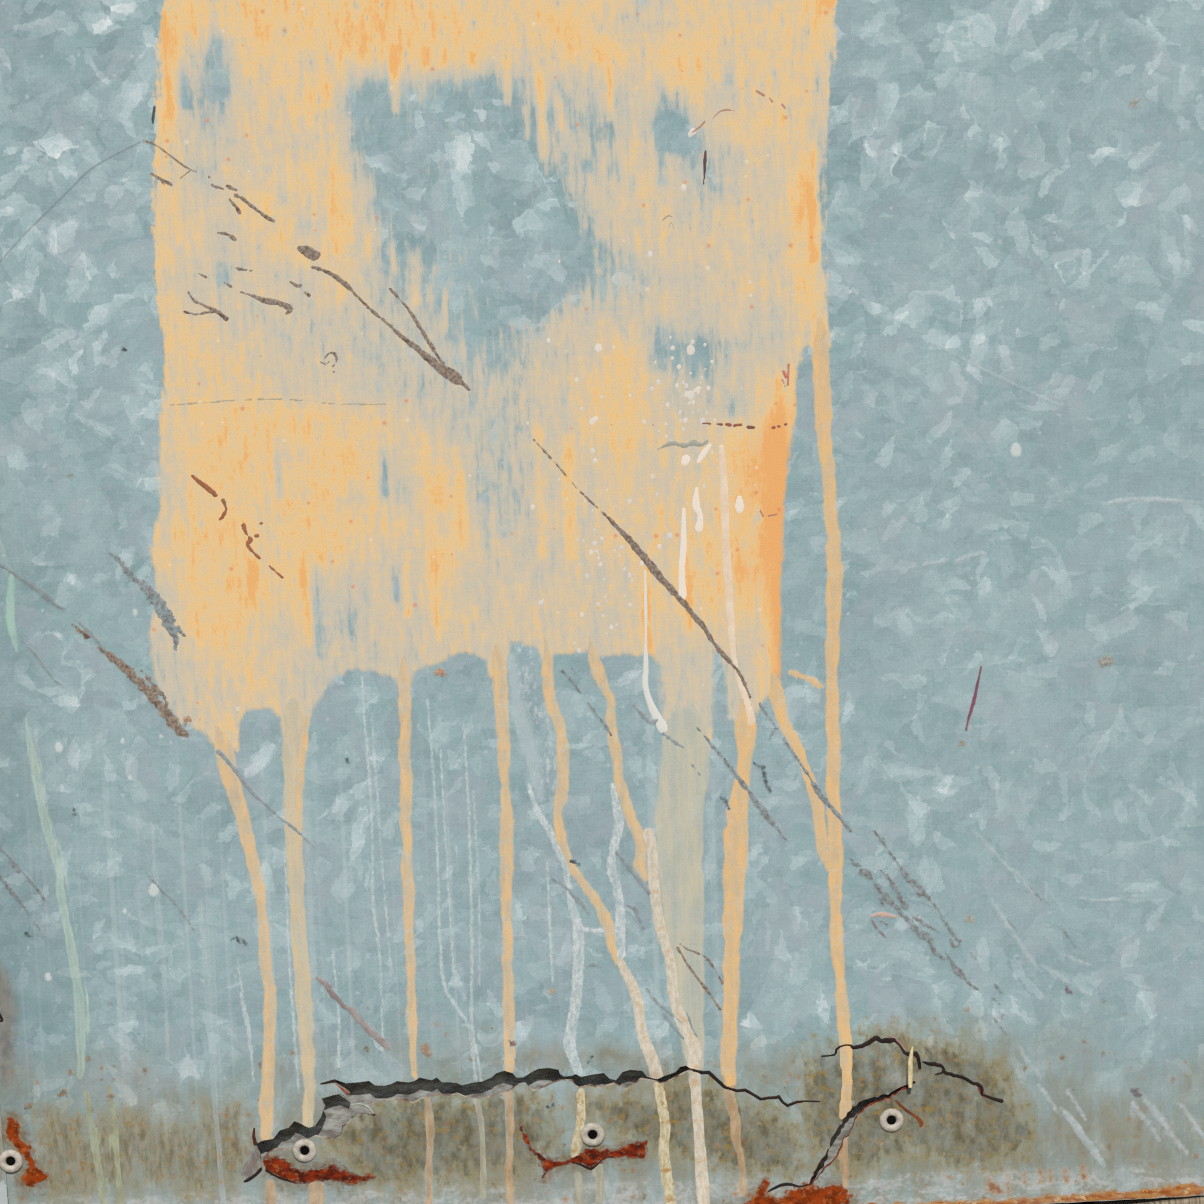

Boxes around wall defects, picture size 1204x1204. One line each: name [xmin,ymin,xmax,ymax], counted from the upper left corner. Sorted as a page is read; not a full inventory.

rust [0,1099,51,1202]
leakage [0,952,280,1204]
rust [240,1147,376,1202]
rust [518,1123,648,1193]
crack [243,1035,1010,1192]
leakage [307,1003,1204,1204]
rust [710,1163,1204,1204]